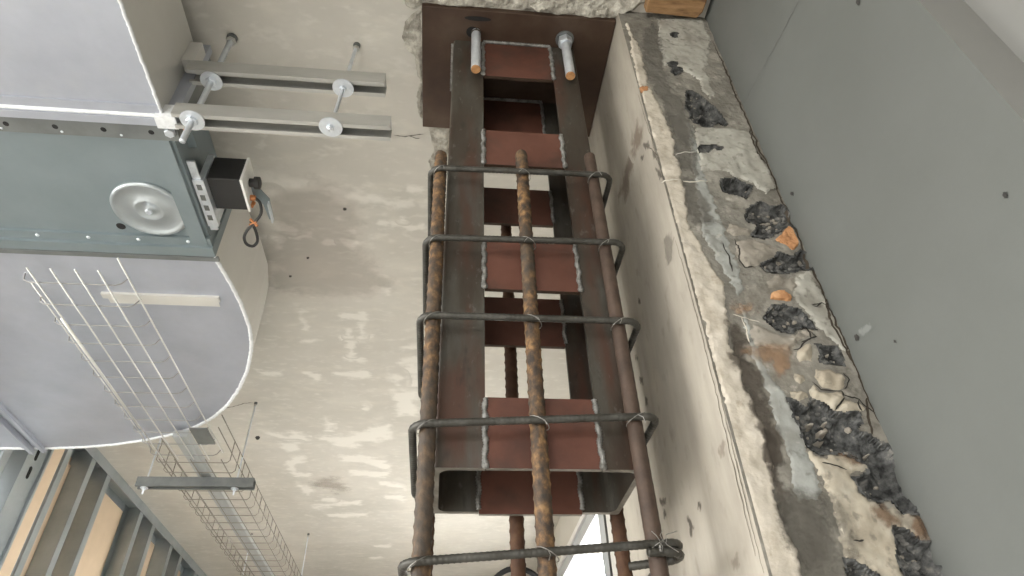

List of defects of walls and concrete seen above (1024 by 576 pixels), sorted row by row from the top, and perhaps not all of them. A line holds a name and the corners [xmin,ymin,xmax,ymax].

flaking render [402,0,943,576]
crack [713,1,880,435]